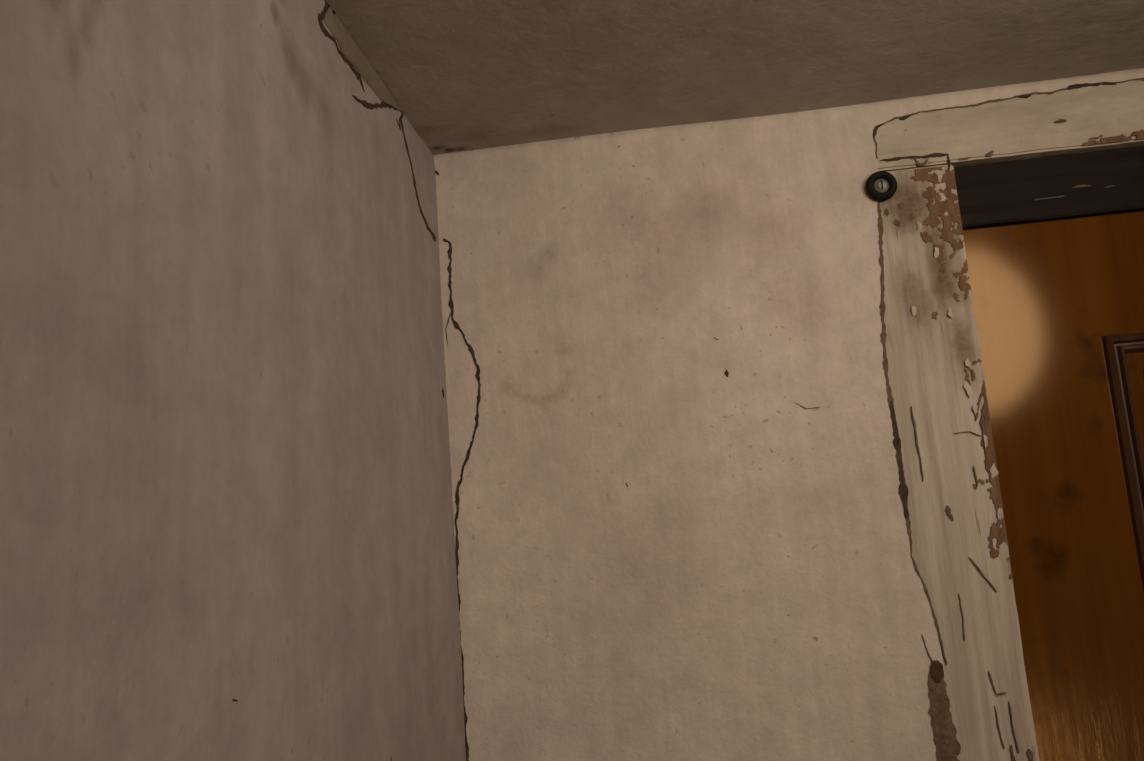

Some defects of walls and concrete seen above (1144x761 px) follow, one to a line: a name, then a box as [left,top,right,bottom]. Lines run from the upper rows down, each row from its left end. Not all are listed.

peeling [1083,129,1144,145]
peeling [884,157,971,320]
crack [318,0,481,761]
peeling [958,337,1013,579]
flaking render [928,660,961,761]
peeling [988,671,1034,761]